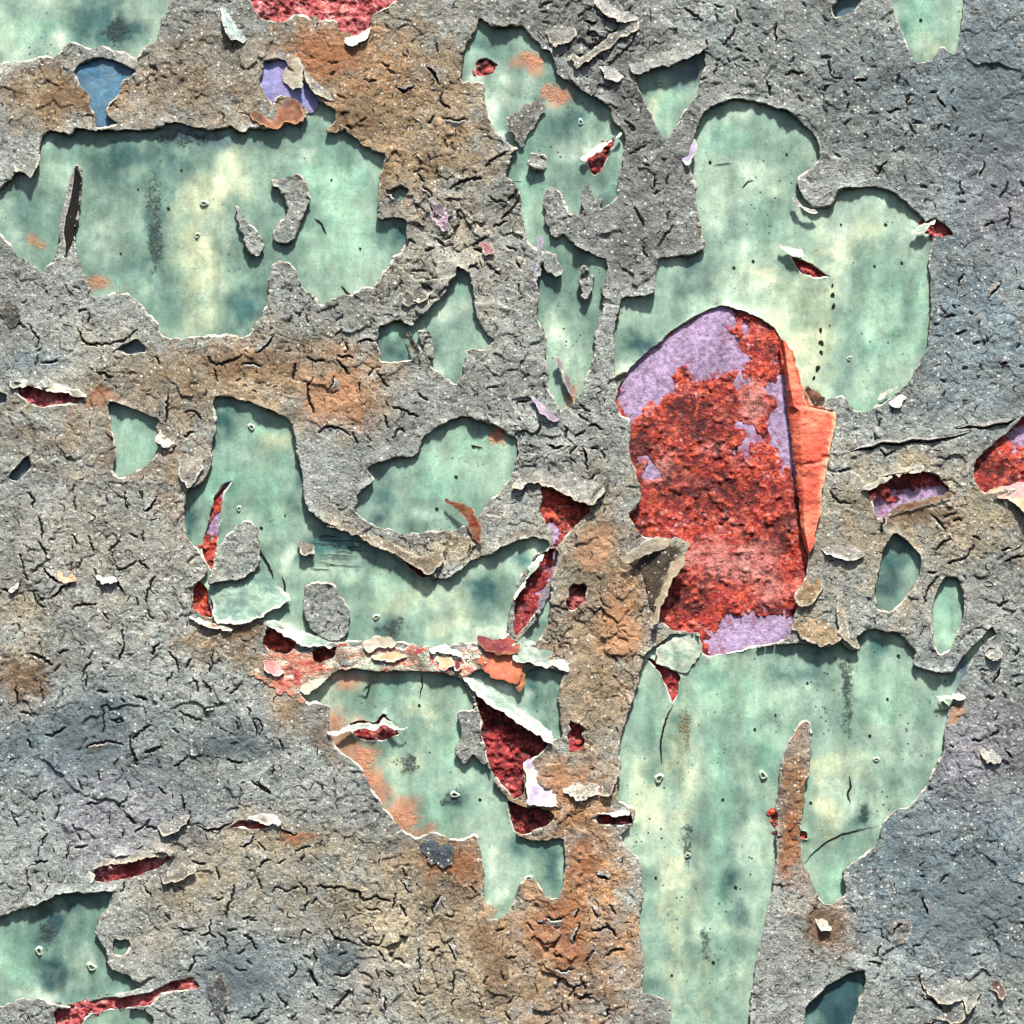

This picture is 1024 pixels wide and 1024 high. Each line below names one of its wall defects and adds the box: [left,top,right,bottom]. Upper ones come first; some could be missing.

peeling [0,0,408,340]
crack [175,8,244,64]
crack [0,268,653,1024]
peeling [178,396,569,919]
corrosion [472,59,498,76]
peeling [460,0,707,422]
corrosion [585,810,632,825]
corrosion [512,302,836,661]
peeling [613,99,933,412]
peeling [563,576,1003,1024]
corrosion [766,808,807,880]
crack [676,0,1024,635]